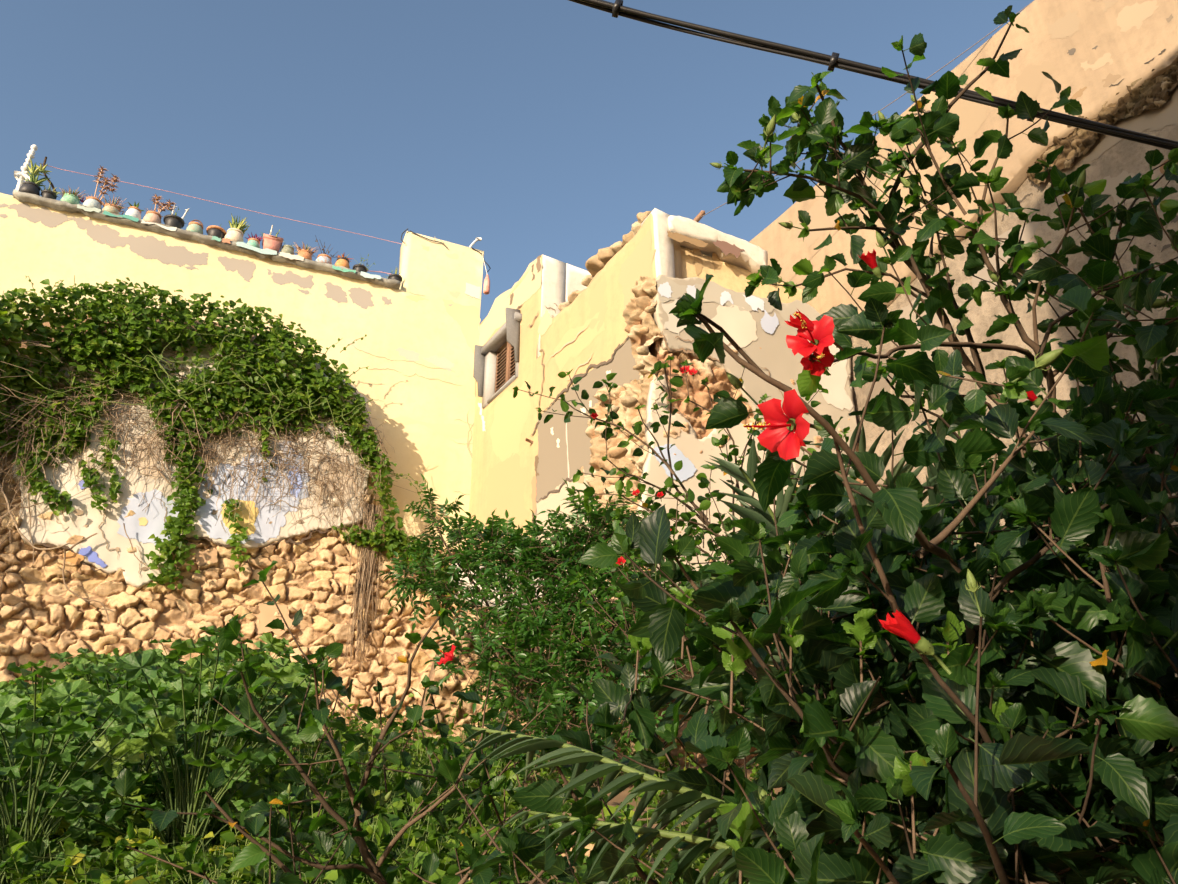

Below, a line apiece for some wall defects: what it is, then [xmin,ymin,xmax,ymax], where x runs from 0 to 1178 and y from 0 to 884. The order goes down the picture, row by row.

spalling [667,231,745,258]
crack [517,303,628,435]
crack [532,478,572,528]